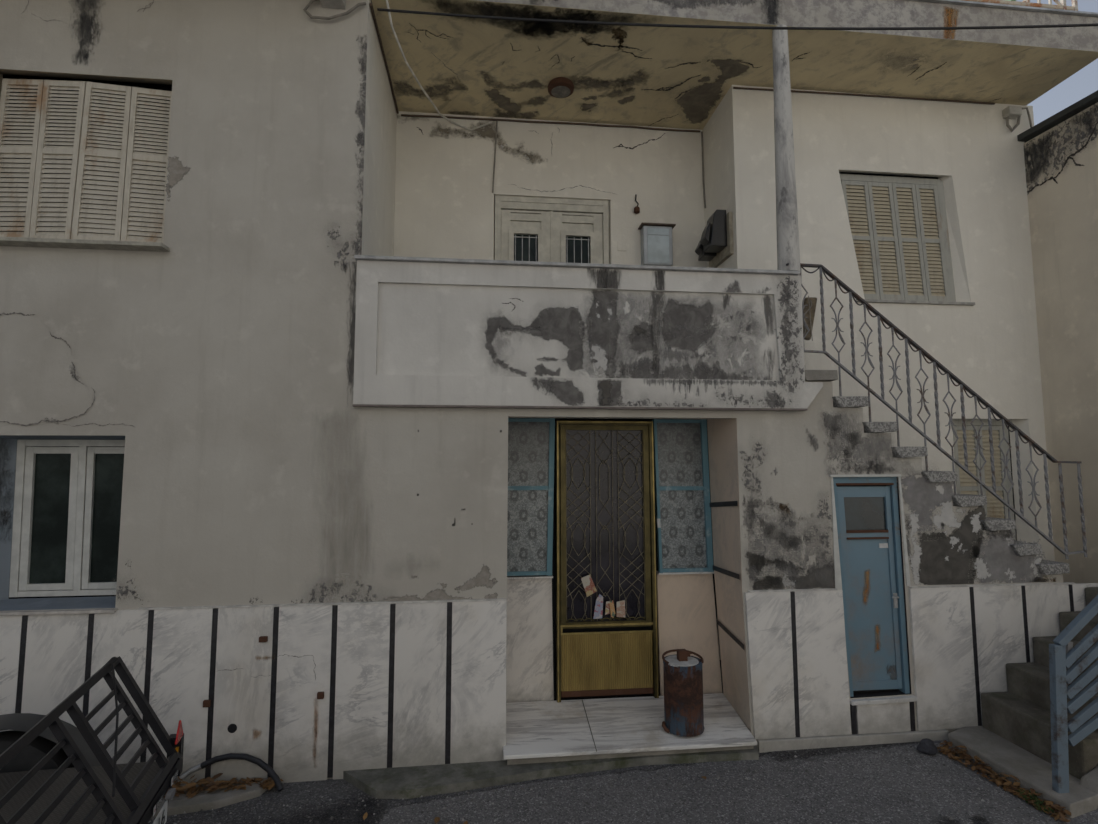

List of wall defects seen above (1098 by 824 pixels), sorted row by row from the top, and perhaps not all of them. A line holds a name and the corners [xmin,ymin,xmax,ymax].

leakage [76,0,100,59]
leakage [573,71,648,97]
flaking render [675,59,749,124]
leakage [432,123,542,163]
leakage [1024,105,1098,195]
flaking render [485,307,586,377]
flaking render [629,299,759,374]
leakage [809,414,891,474]
leakage [743,498,826,586]
flaking render [896,471,1056,585]
flaking render [291,564,498,604]